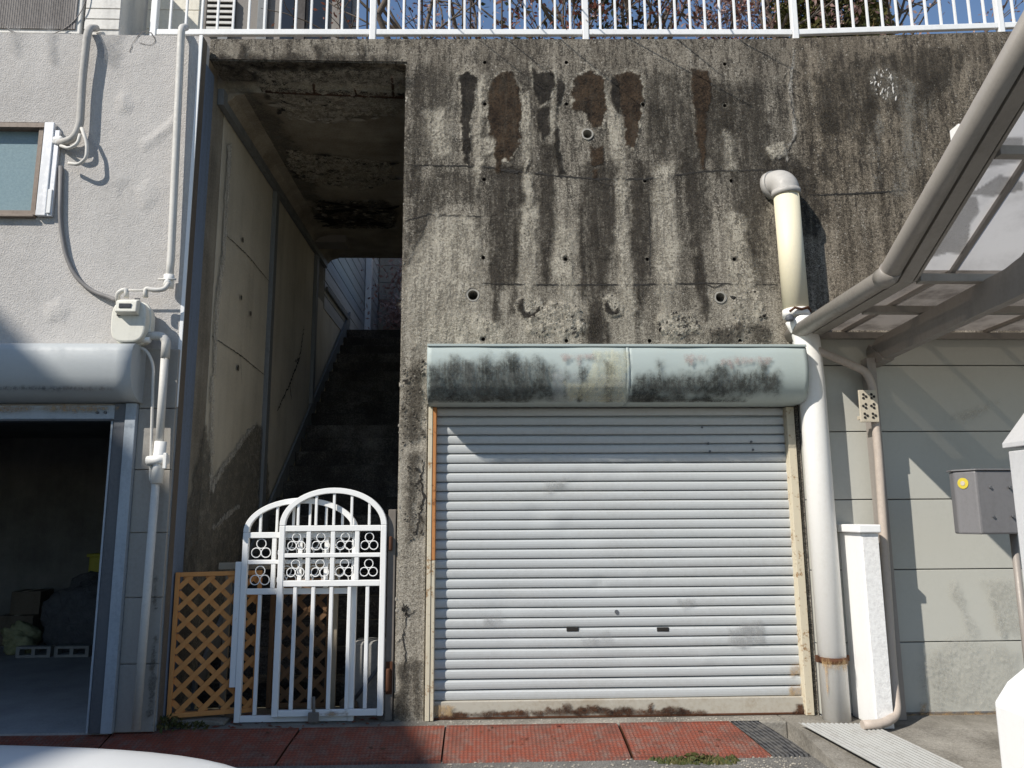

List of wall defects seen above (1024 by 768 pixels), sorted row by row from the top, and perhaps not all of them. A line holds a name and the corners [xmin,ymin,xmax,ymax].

corrosion [456,62,645,178]
corrosion [691,68,712,170]
water stain [813,48,963,164]
water stain [210,44,830,348]
water stain [972,176,1023,196]
crack [415,464,428,534]